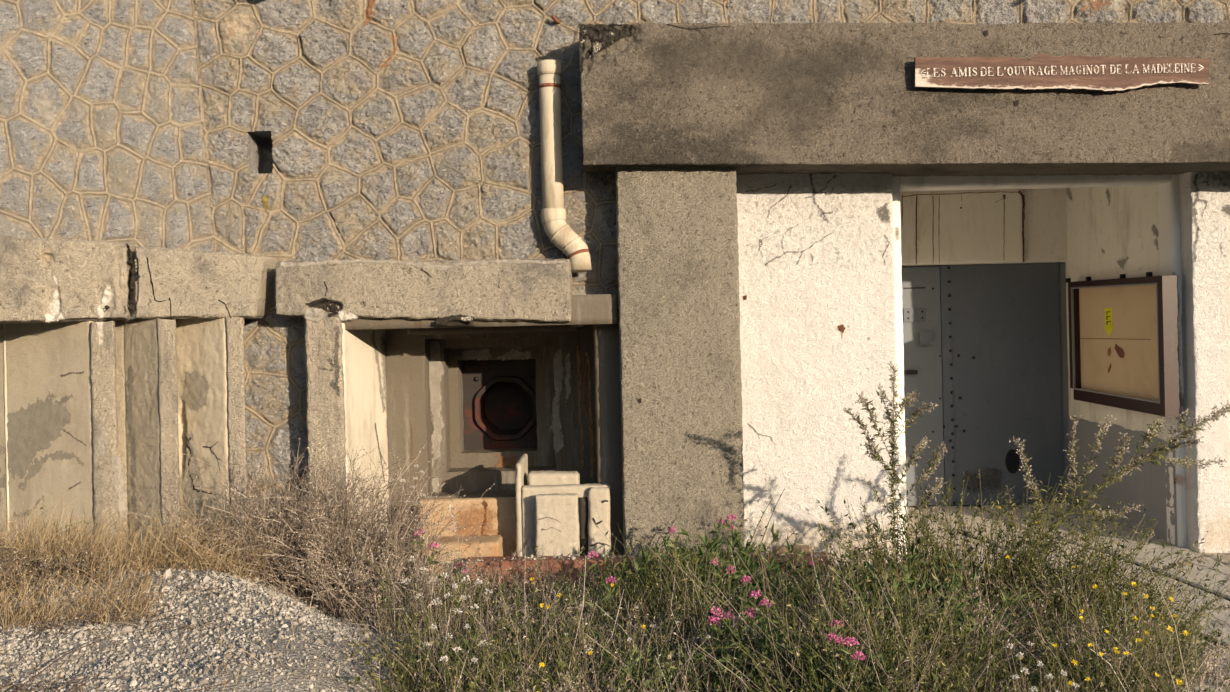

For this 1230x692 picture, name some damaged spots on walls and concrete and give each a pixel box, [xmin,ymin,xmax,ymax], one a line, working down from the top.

spalling [578,23,637,72]
crack [146,257,172,318]
spalling [305,298,357,396]
damp [0,393,84,495]
damp [98,428,126,518]